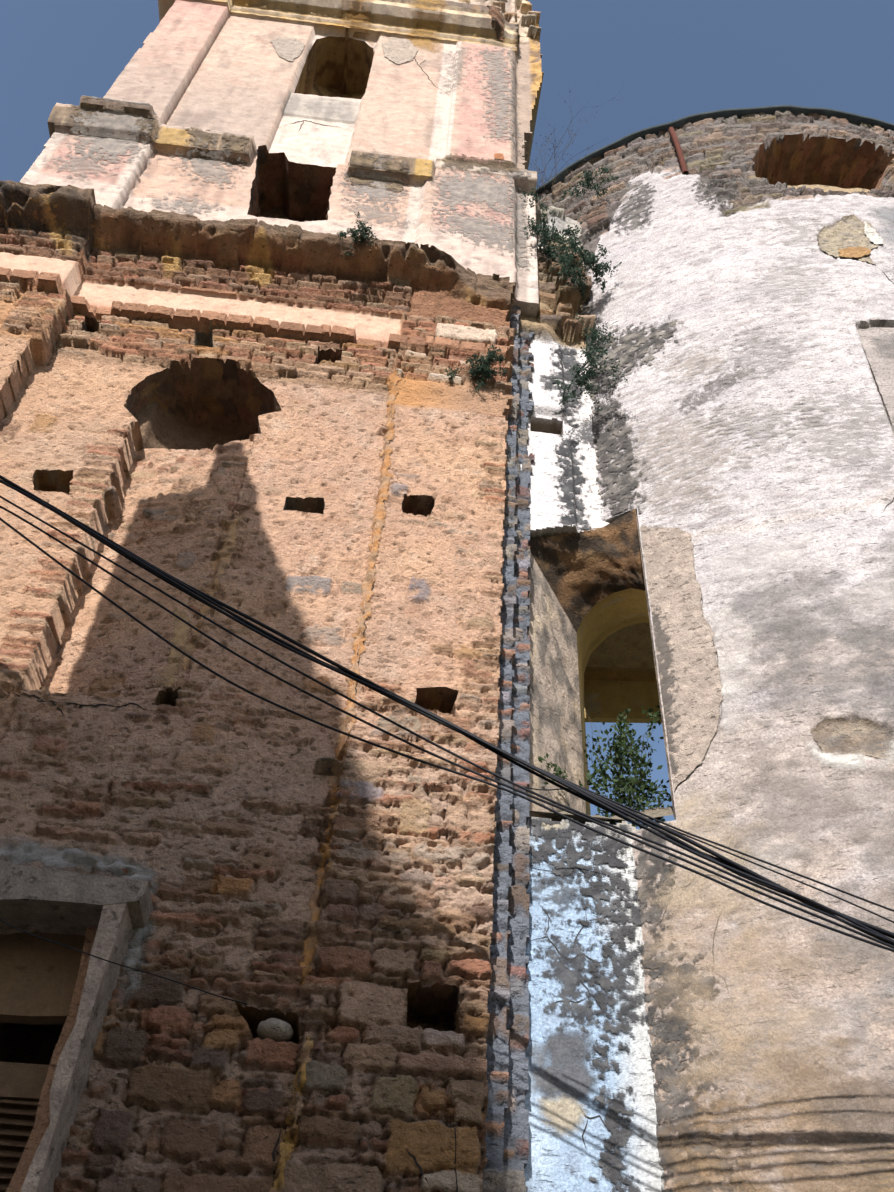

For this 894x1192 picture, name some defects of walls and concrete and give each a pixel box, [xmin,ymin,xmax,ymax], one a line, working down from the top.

flaking render [817,214,884,264]
crack [176,514,243,686]
crack [8,692,162,717]
flaking render [808,717,894,770]
water stain [823,932,890,968]
water stain [527,817,768,1192]
water stain [819,1084,894,1158]